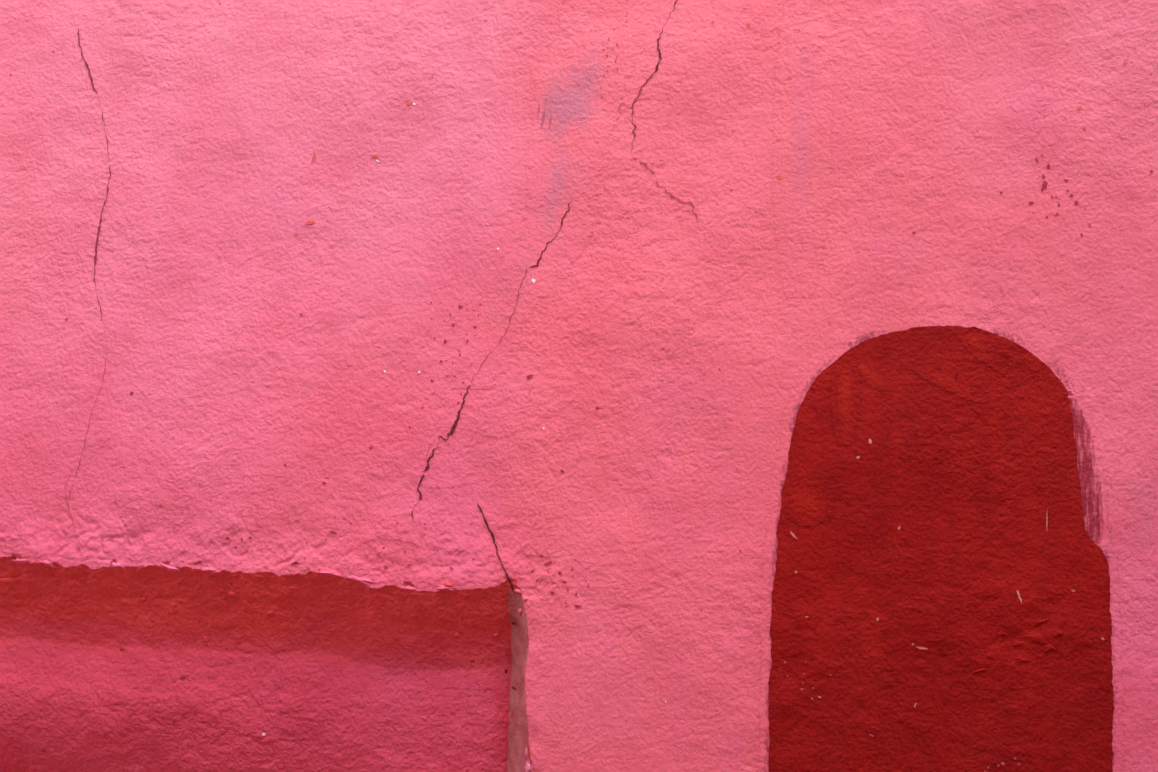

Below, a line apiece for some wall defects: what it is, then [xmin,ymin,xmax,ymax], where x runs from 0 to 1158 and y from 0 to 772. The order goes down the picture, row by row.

crack [65,28,111,546]
crack [378,204,570,593]
crack [617,0,700,231]